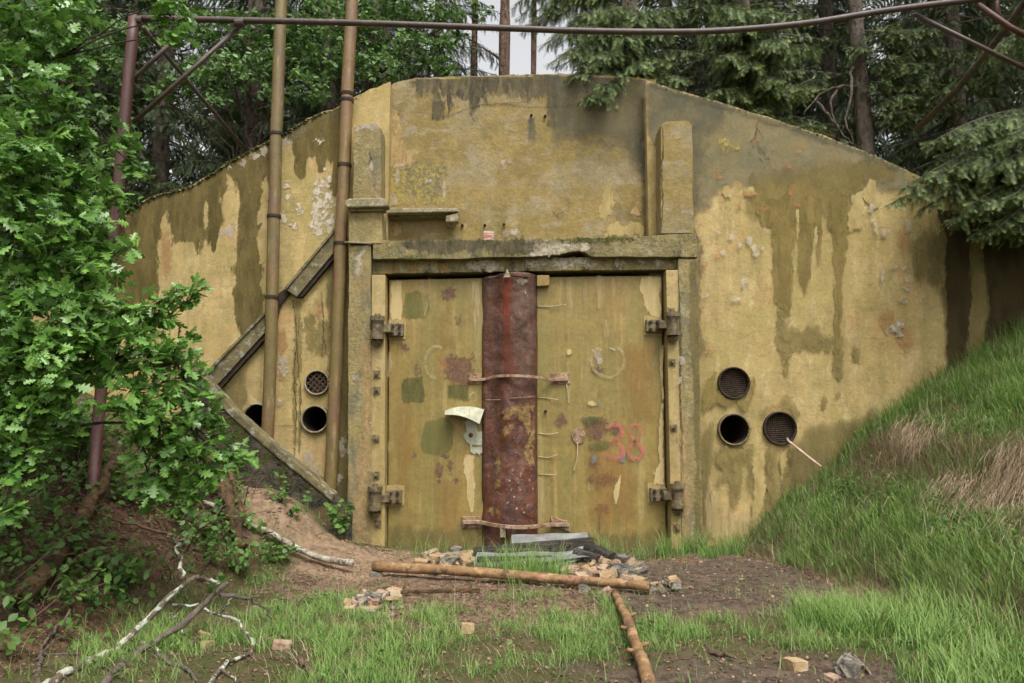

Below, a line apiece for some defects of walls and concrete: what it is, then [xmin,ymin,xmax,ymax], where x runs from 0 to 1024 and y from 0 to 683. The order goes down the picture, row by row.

water stain [432,77,489,120]
water stain [100,143,270,335]
peeling [256,168,336,264]
rust [438,353,475,389]
peeling [465,184,663,373]
water stain [690,162,894,546]
water stain [911,209,1024,373]
peeling [463,454,475,512]